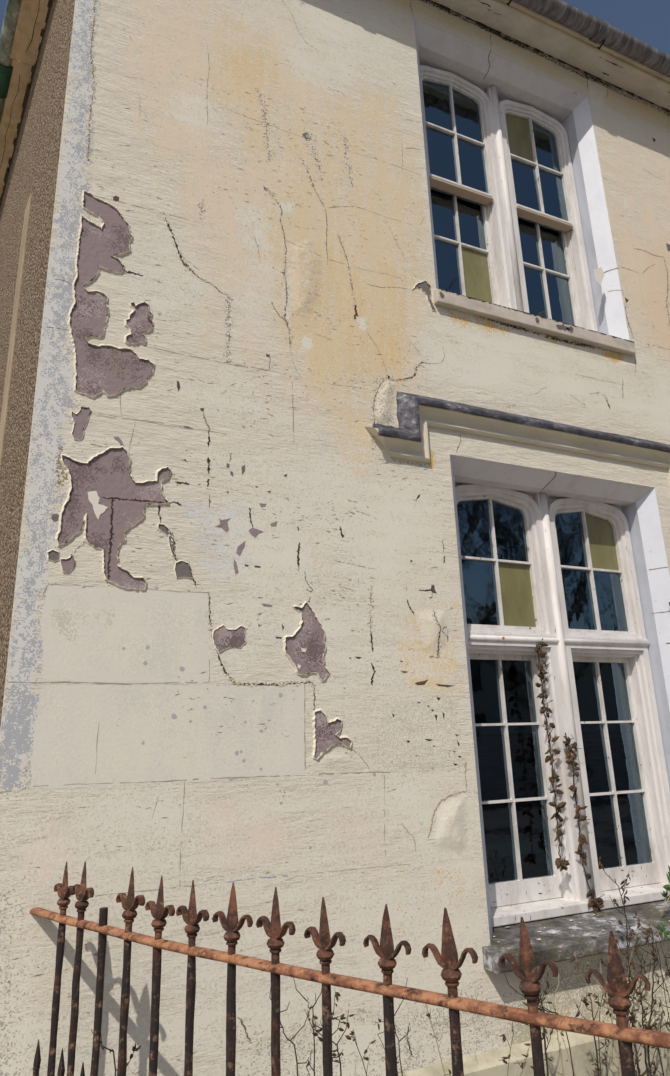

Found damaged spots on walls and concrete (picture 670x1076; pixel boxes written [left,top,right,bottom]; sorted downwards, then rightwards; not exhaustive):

crack [303,132,445,427]
damp [101,0,670,482]
peeling [0,0,508,1076]